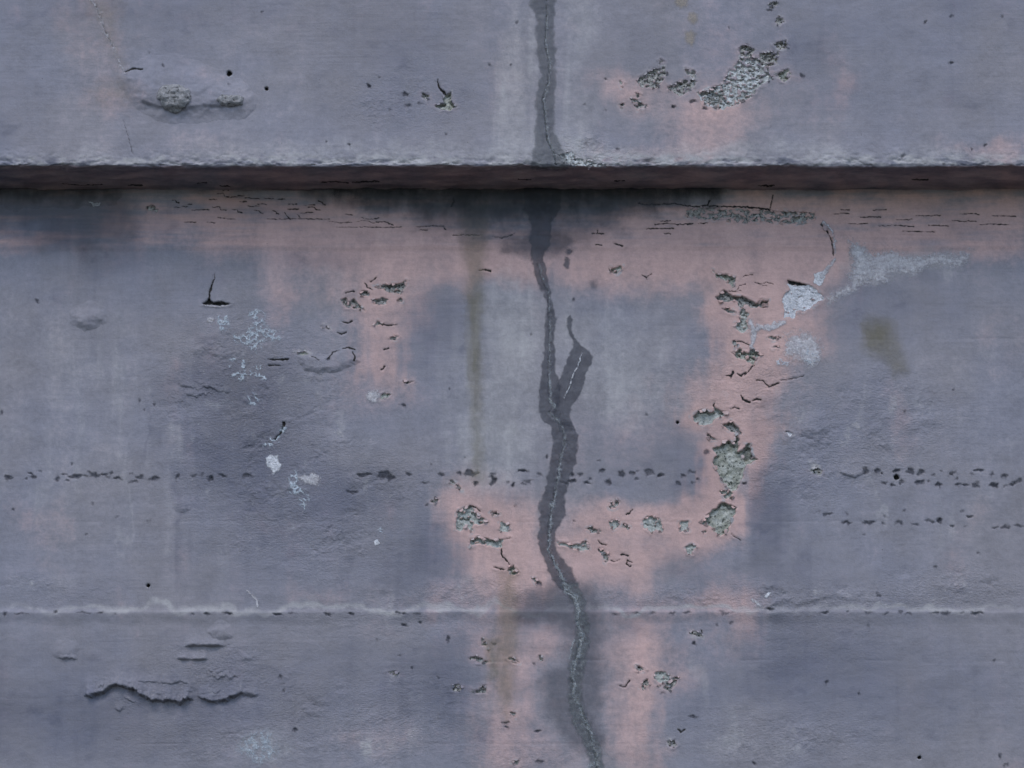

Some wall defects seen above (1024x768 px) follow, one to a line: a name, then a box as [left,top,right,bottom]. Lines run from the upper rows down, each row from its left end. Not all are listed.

peeling [619,41,804,110]
crack [203,276,229,307]
peeling [321,277,406,335]
peeling [713,271,769,376]
peeling [685,206,836,319]
damp [777,333,821,367]
damp [827,243,970,304]
spalling [678,403,757,555]
spalling [456,505,519,575]
peeling [557,498,633,567]
peeling [643,514,663,534]
peeling [622,666,679,692]